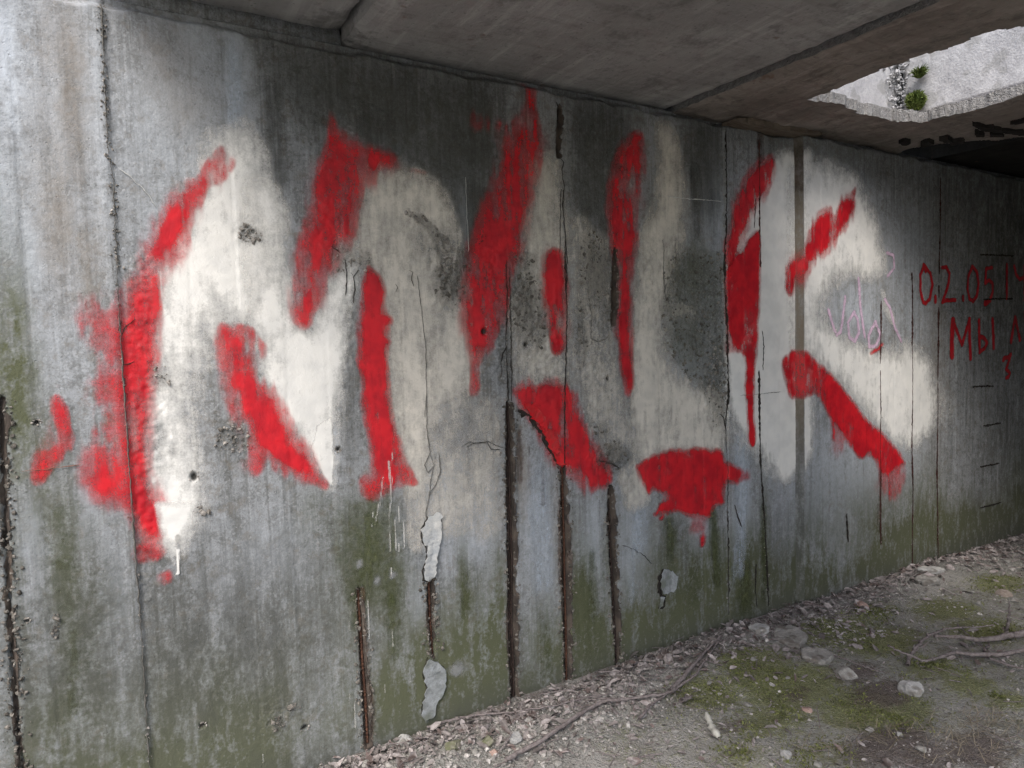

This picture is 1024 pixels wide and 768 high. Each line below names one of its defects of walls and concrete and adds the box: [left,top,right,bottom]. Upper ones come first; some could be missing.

crack [396,270,506,520]
damp [344,501,395,652]
peeling [419,512,447,721]
peeling [657,569,678,609]
damp [709,508,720,585]